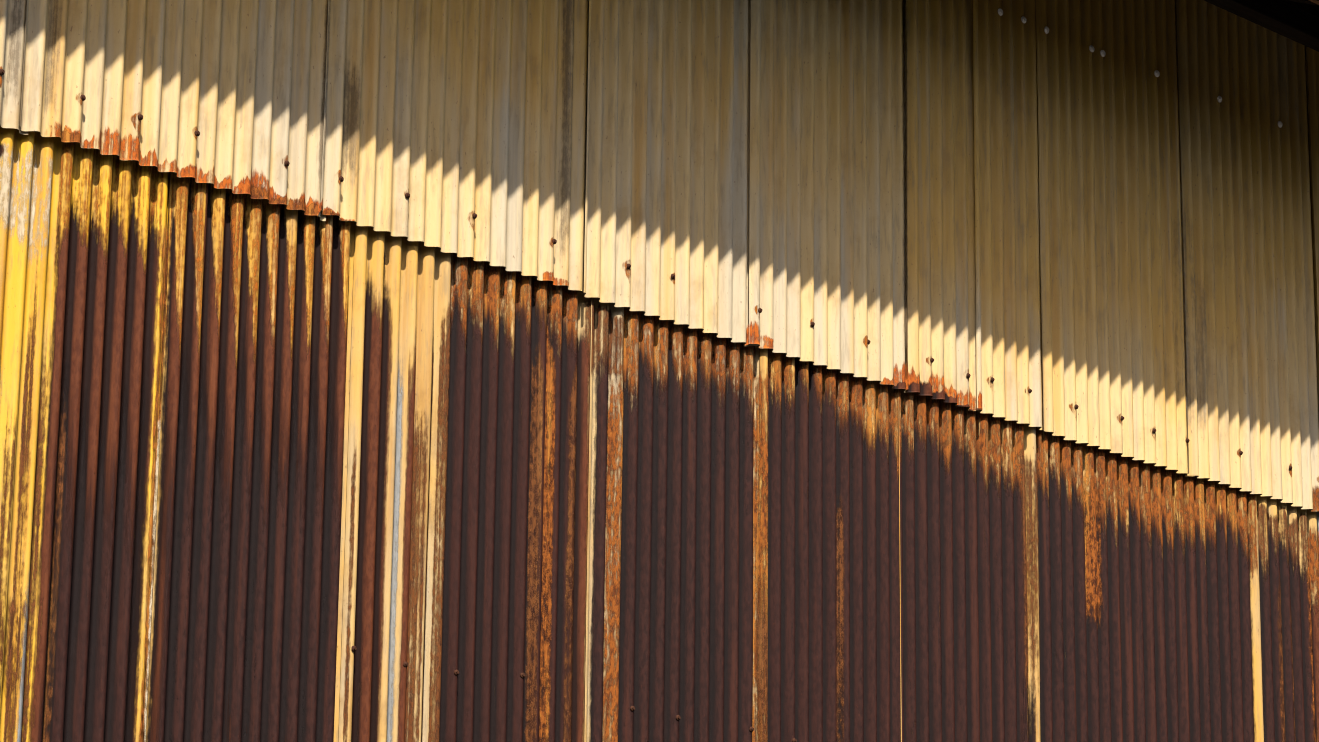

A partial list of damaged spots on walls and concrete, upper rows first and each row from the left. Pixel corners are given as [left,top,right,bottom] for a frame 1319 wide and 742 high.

rust [0,112,392,742]
rust [398,253,1319,742]